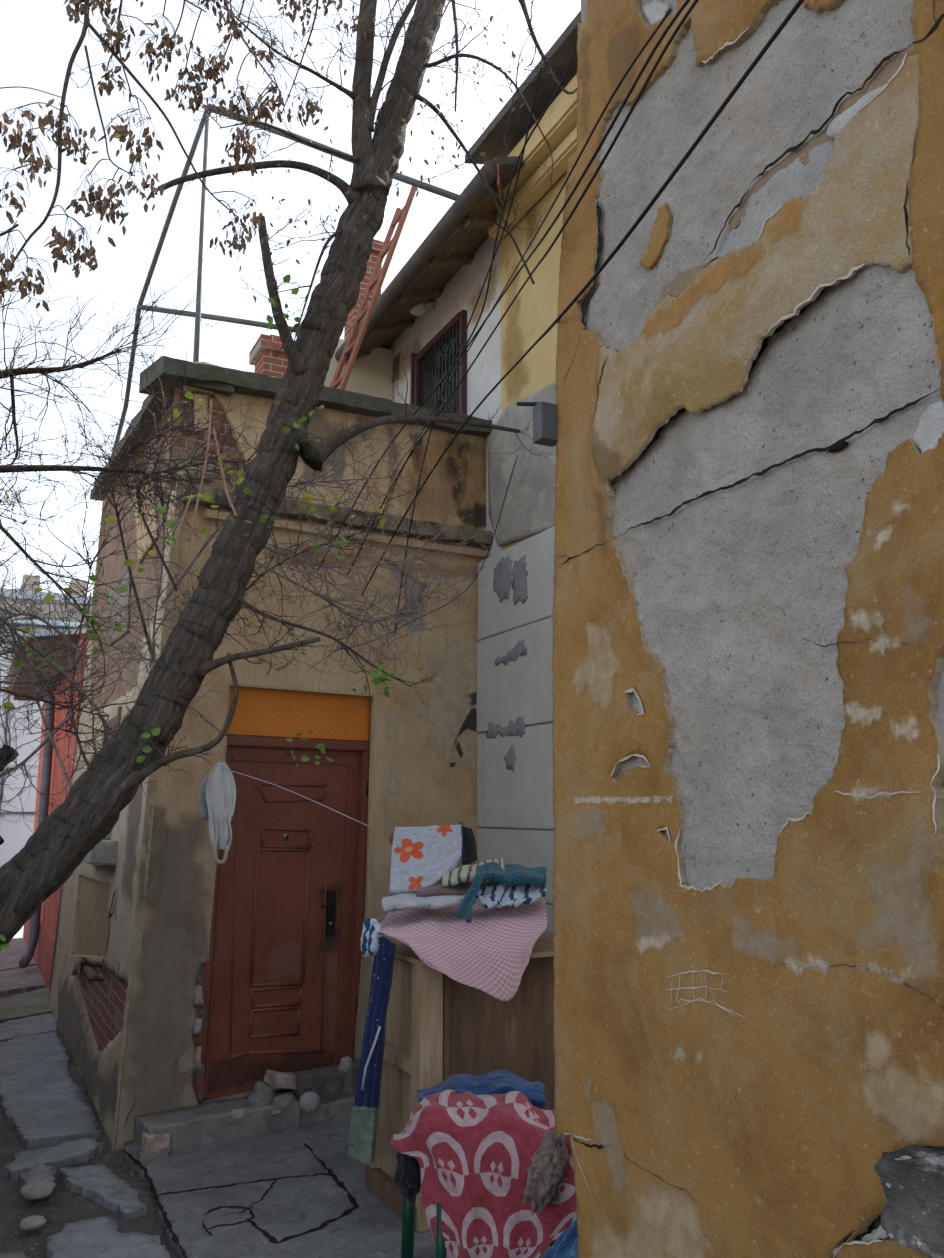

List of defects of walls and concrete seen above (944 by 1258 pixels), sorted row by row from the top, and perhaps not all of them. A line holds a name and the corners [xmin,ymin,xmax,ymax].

spalling [581,0,915,353]
crack [903,132,917,255]
damp [446,439,486,527]
spalling [573,264,944,892]
spalling [72,962,128,1063]
crack [563,1132,703,1216]
crack [833,1234,882,1258]
spalling [860,1214,891,1242]